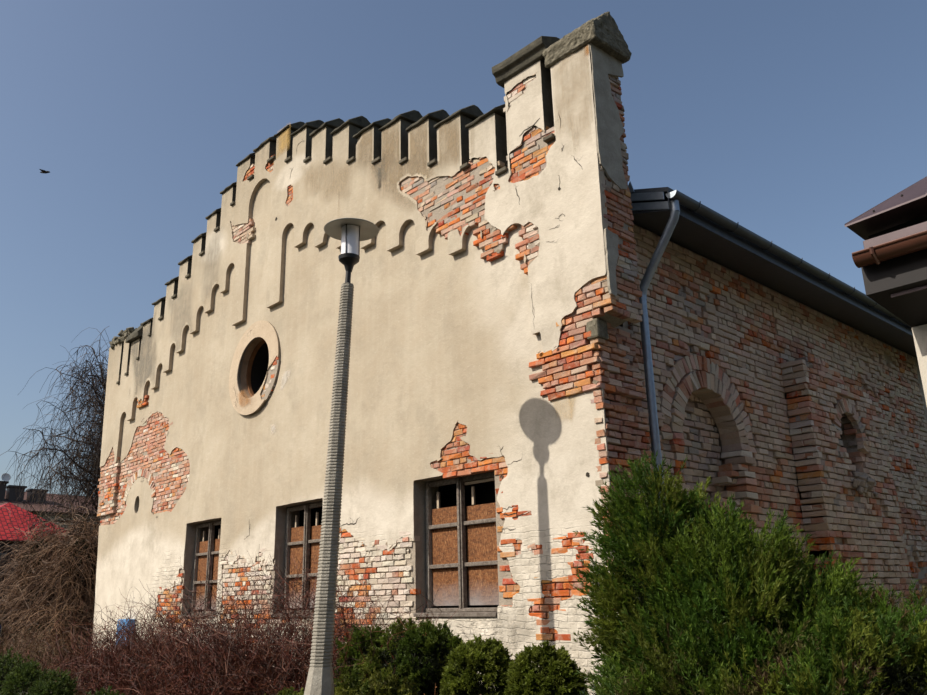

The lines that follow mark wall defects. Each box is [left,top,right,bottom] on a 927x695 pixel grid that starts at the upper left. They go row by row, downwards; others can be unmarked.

flaking render [503,72,537,114]
flaking render [231,218,256,244]
flaking render [398,126,556,275]
flaking render [529,275,616,401]
flaking render [97,395,190,525]
flaking render [156,566,192,631]
flaking render [220,548,292,643]
flaking render [334,526,432,643]
flaking render [431,421,594,641]